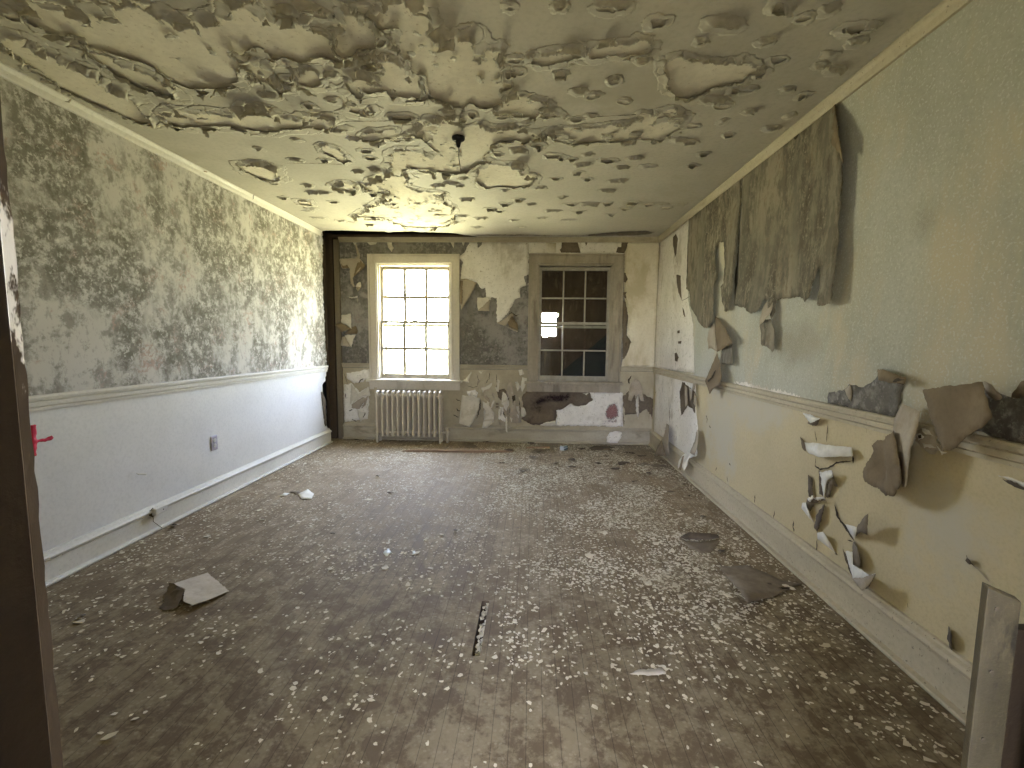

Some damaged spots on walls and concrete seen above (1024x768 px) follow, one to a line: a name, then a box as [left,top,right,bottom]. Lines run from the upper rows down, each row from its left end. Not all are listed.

peeling [762,0,883,77]
peeling [0,0,791,232]
peeling [451,222,698,453]
peeling [343,369,370,422]
peeling [915,426,947,455]